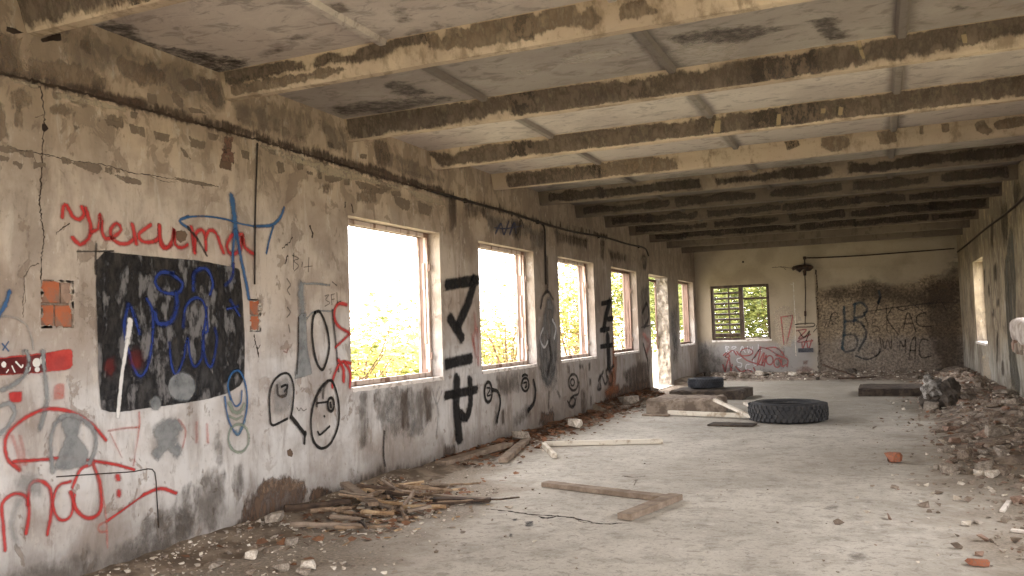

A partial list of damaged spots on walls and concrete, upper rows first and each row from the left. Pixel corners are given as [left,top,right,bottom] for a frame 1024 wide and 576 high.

crack [0,72,427,317]
flaking render [265,140,443,216]
flaking render [41,279,74,328]
flaking render [249,299,261,332]
damp [115,477,221,562]
damp [237,467,332,524]